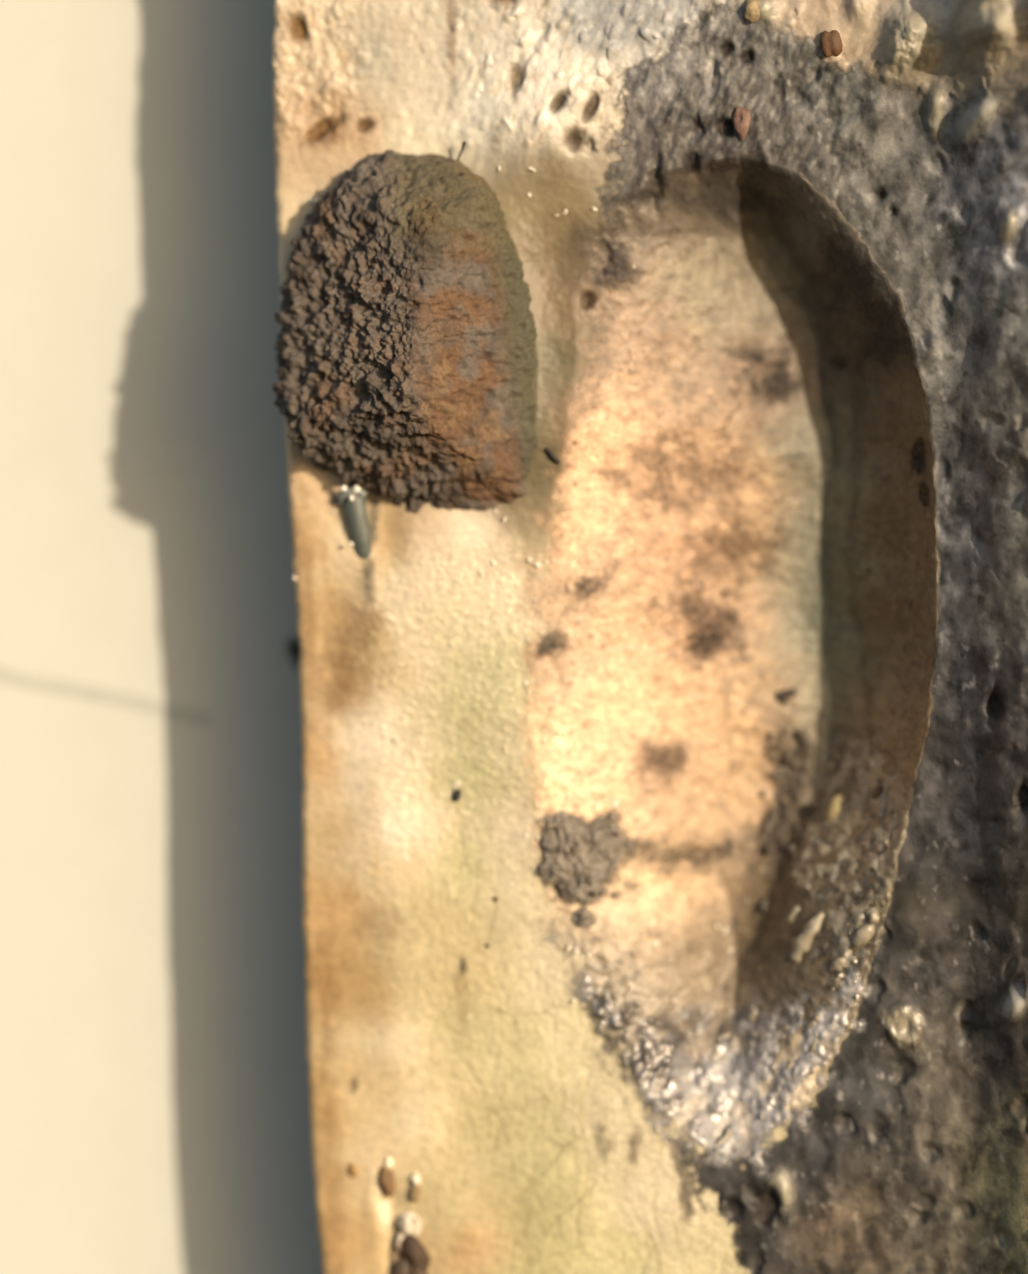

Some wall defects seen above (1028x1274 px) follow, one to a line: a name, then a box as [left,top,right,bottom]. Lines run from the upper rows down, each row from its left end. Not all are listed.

spalling [511,65,523,91]
water stain [587,244,636,306]
water stain [742,350,801,402]
water stain [911,440,929,506]
water stain [684,598,737,656]
spalling [524,4,1028,1274]
water stain [574,728,901,1216]
water stain [1001,1174,1028,1274]